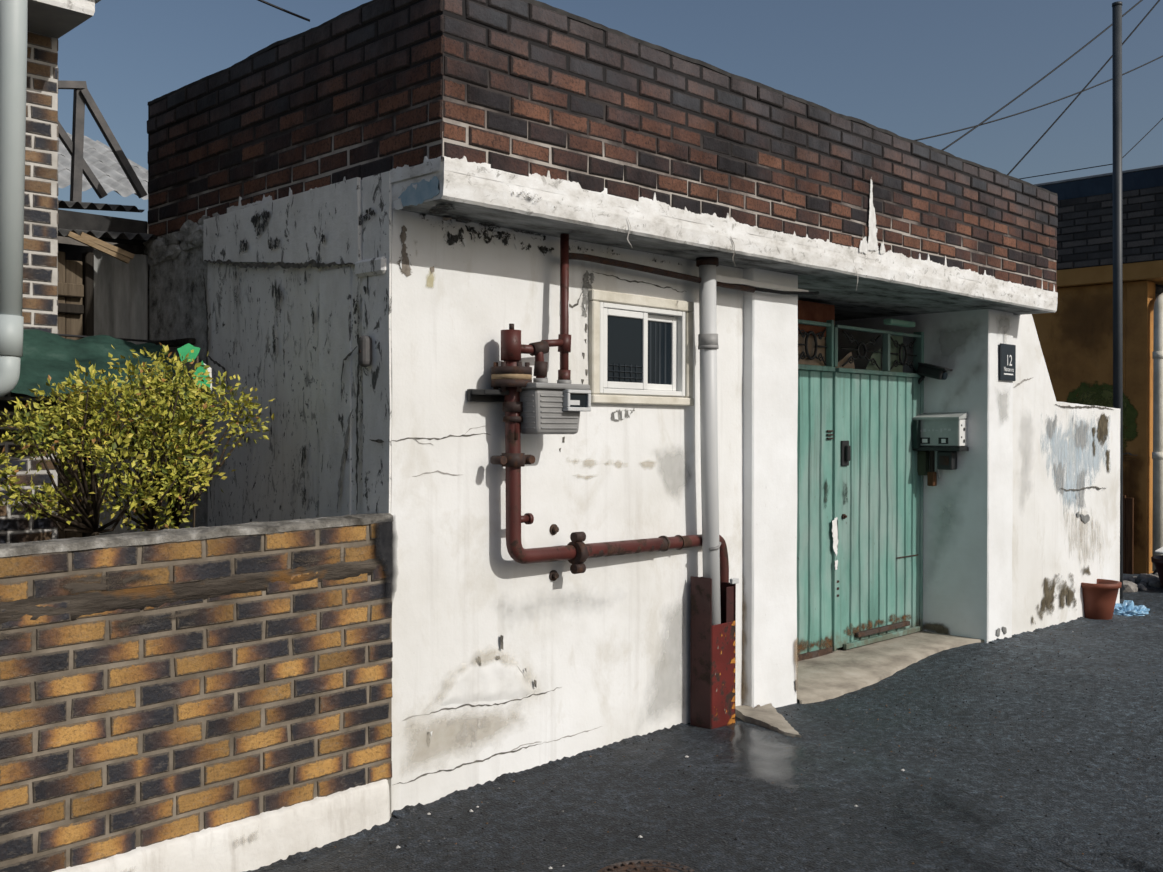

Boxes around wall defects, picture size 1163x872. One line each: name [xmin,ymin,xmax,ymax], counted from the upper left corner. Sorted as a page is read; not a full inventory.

peeling [239,209,280,254]
peeling [398,226,413,276]
peeling [393,176,554,255]
crack [203,259,489,510]
peeling [1042,414,1110,524]
corrosion [794,615,911,691]
crack [403,666,562,721]
crack [394,726,601,785]